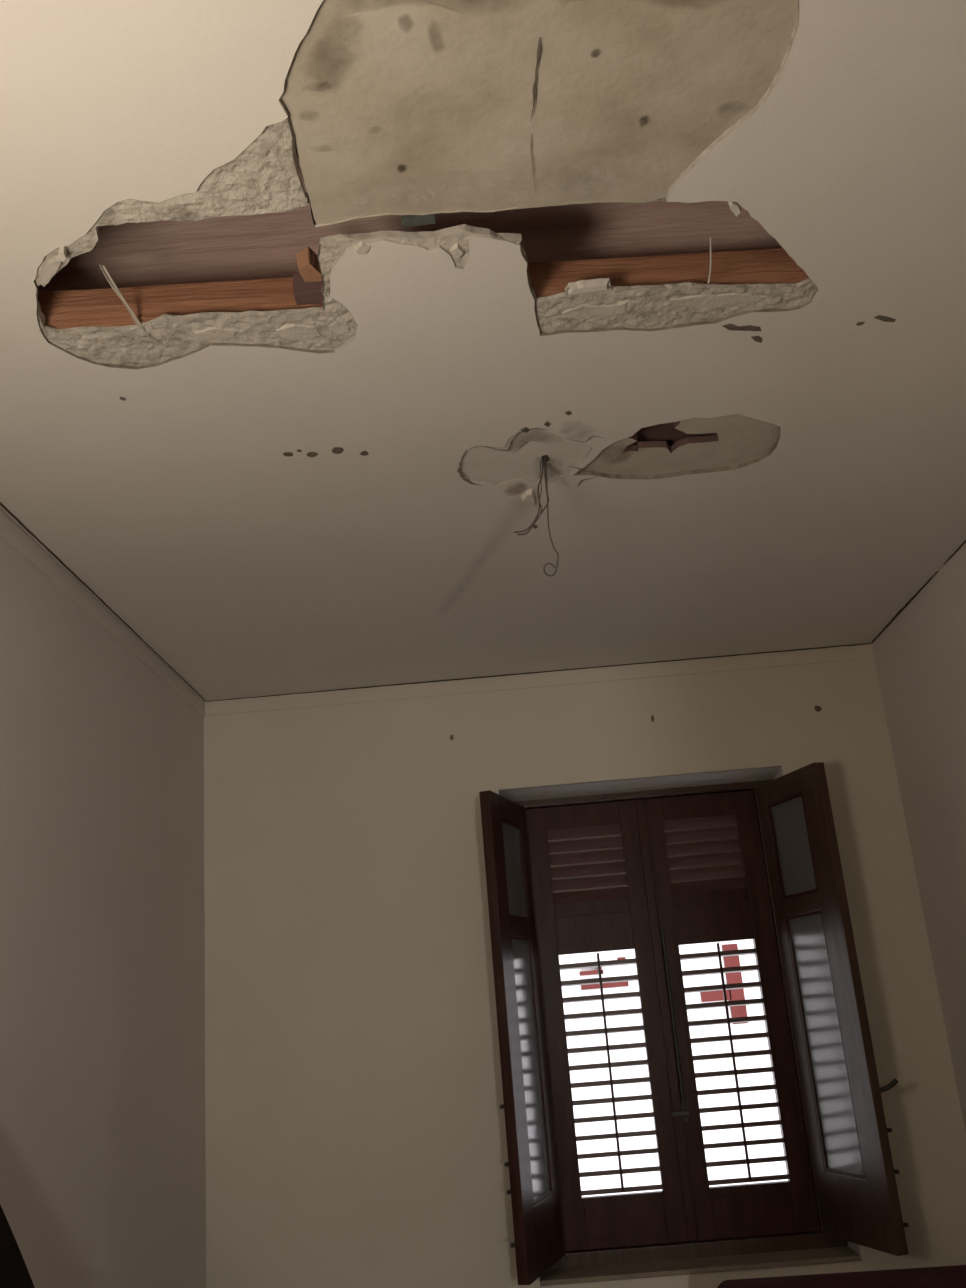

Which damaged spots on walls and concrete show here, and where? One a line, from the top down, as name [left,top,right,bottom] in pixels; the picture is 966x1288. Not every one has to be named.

flaking render [34,0,818,370]
spalling [457,414,780,506]